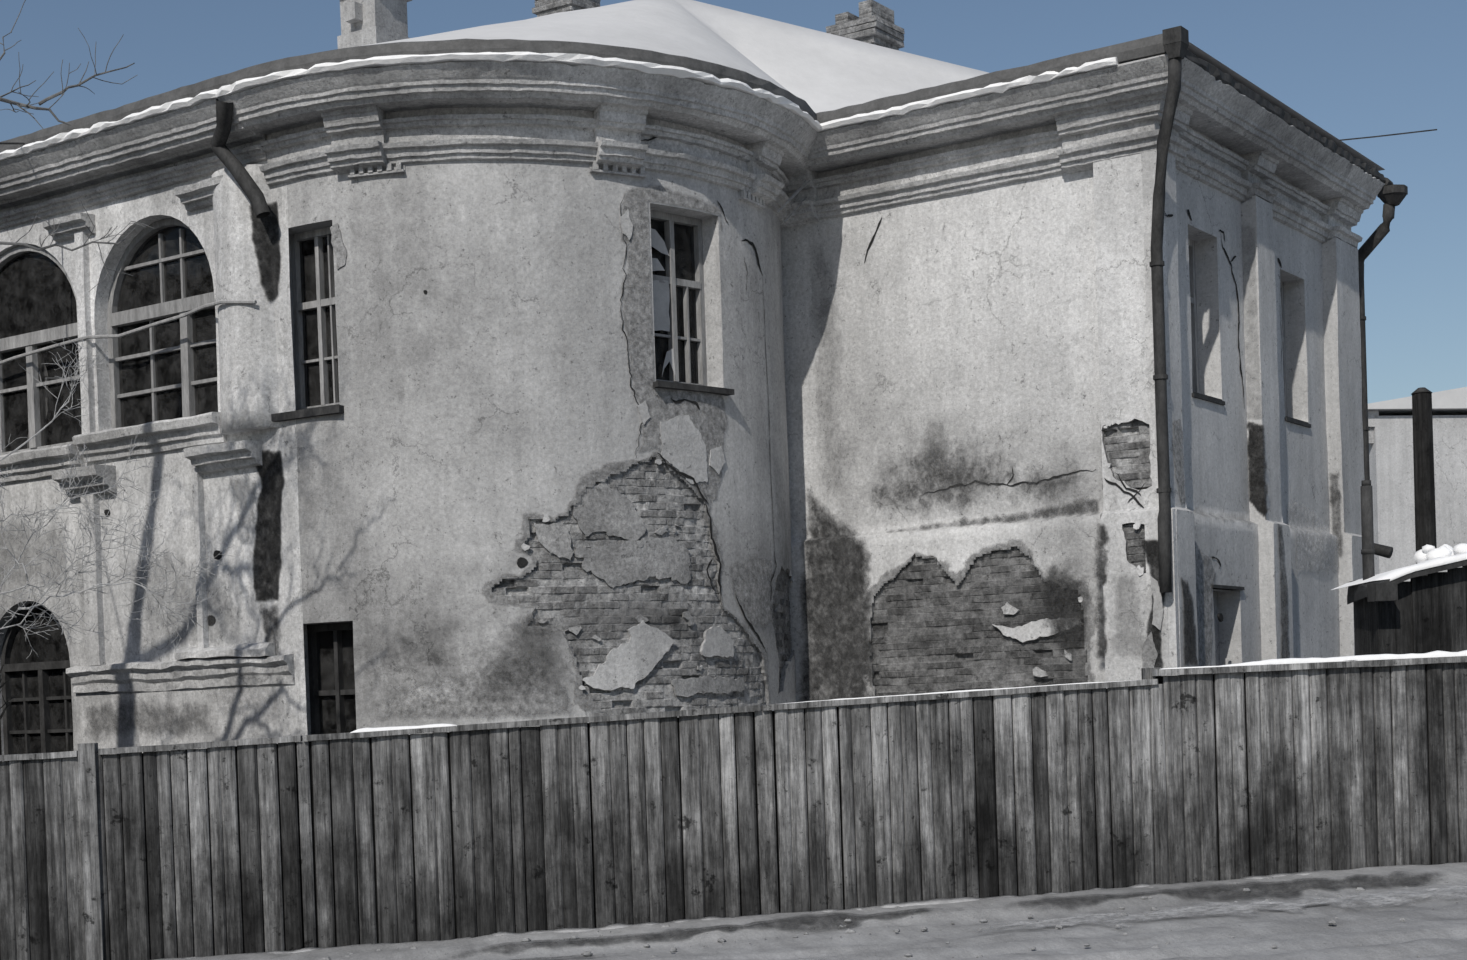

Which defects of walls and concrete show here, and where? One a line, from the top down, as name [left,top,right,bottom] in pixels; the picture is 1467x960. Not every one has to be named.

water stain [250,202,280,301]
crack [1165,209,1245,409]
water stain [253,450,284,655]
spalling [376,186,796,719]
water stain [800,496,872,702]
spalling [863,539,1097,703]
water stain [875,450,1108,658]
crack [921,468,1145,508]
spalling [1101,418,1152,490]